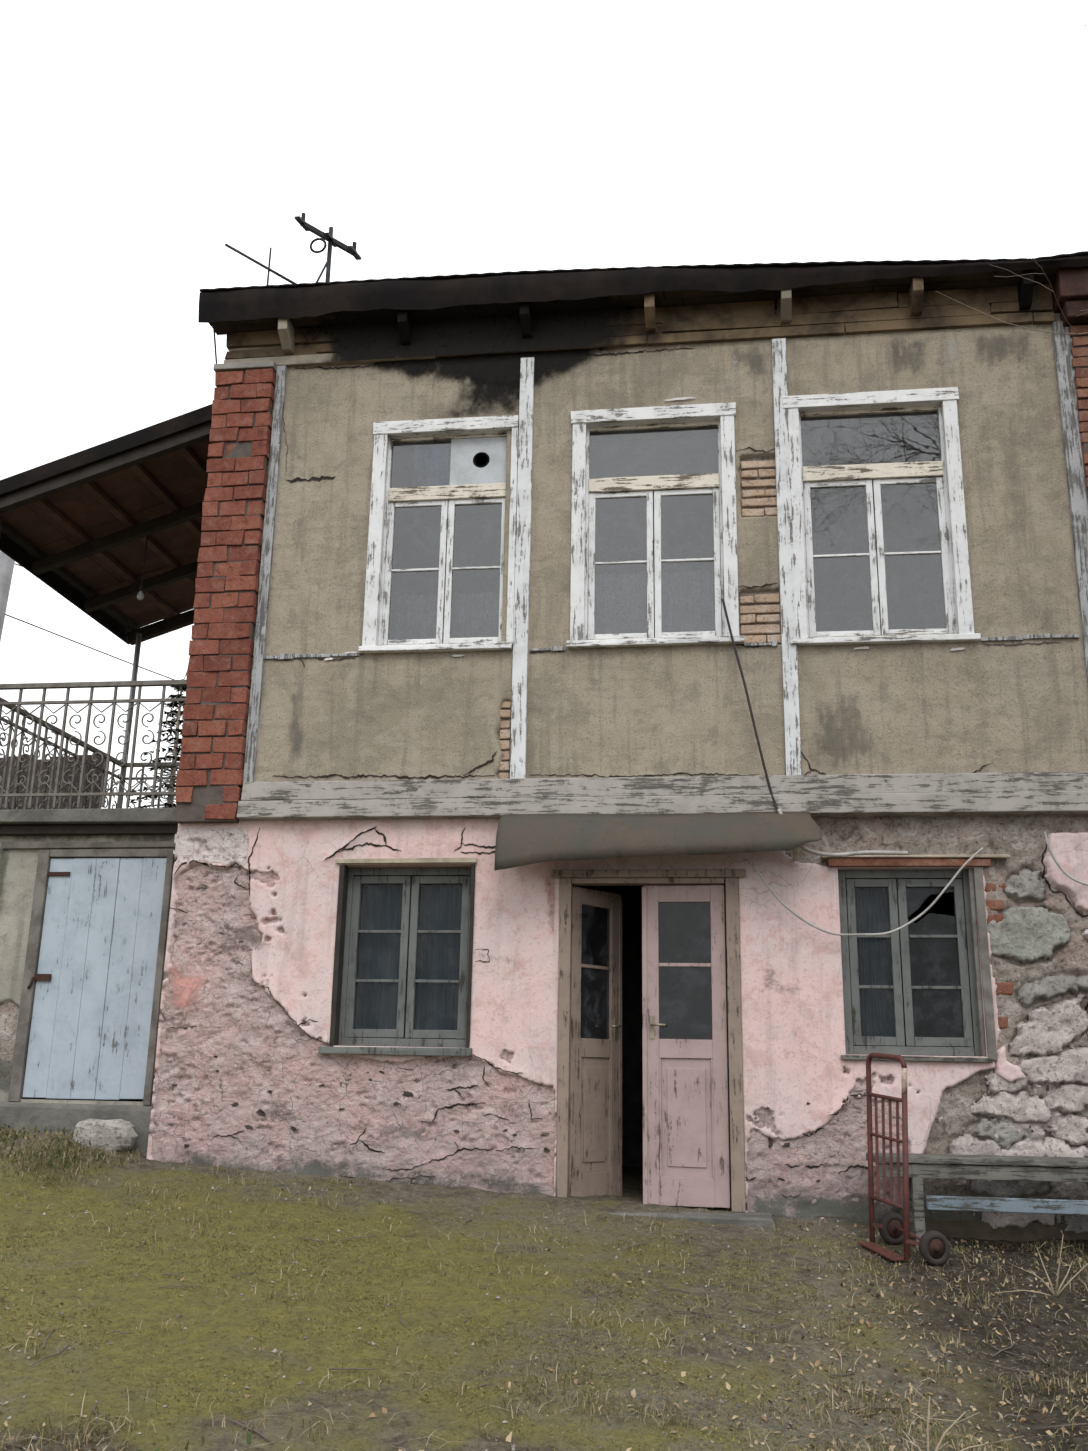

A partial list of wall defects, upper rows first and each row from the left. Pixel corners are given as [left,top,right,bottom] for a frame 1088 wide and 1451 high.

spalling [738,457,777,517]
spalling [739,590,781,645]
spalling [497,701,512,779]
crack [325,826,401,860]
crack [454,827,496,855]
spalling [0,1001,20,1080]
peeling [151,828,557,1196]
spalling [746,815,1088,1233]
crack [338,1054,540,1182]